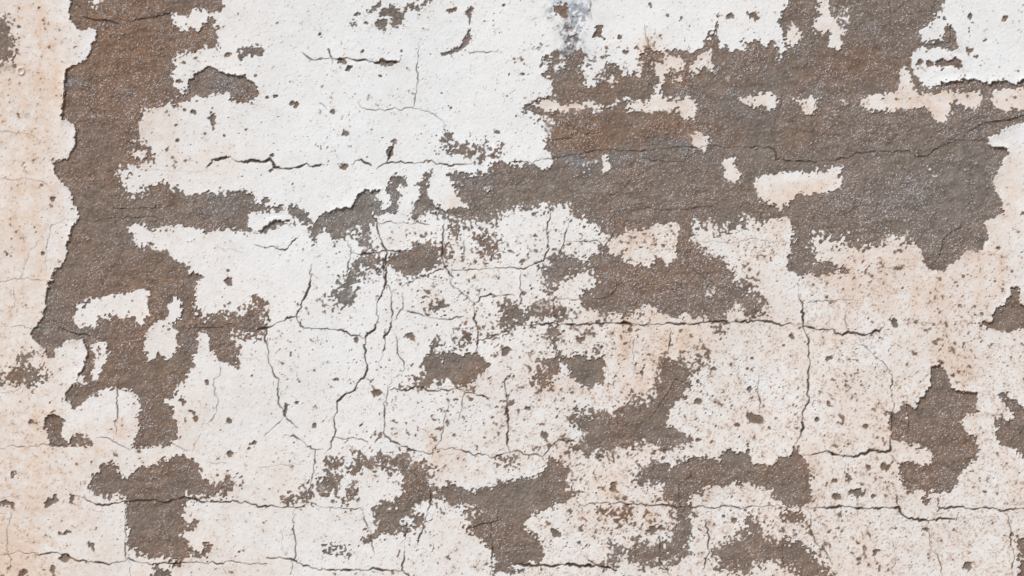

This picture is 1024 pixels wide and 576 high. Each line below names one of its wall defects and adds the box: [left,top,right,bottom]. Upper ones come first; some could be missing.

crack [0,130,40,140]
crack [0,166,51,187]
crack [146,155,325,174]
crack [300,42,477,170]
peeling [0,0,1024,459]
crack [0,202,1024,576]
peeling [280,325,981,576]
peeling [70,454,242,576]